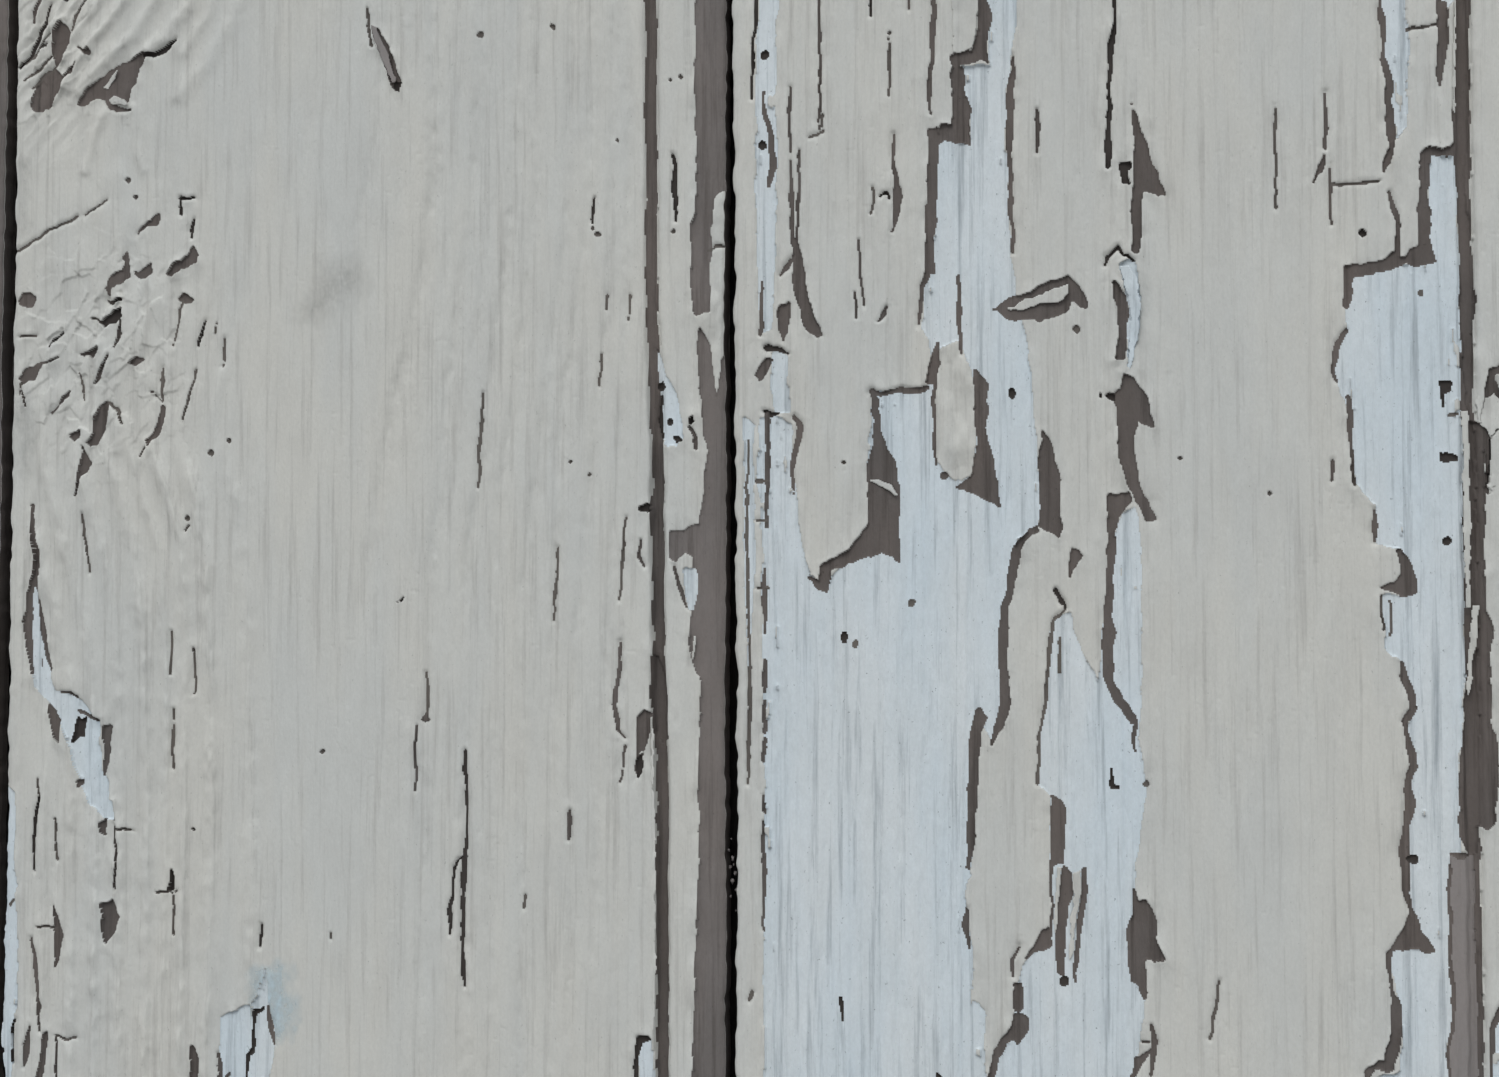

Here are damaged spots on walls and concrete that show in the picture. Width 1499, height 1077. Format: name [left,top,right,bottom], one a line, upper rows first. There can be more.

peeling [30,20,91,112]
peeling [77,39,177,112]
peeling [0,0,43,504]
peeling [51,345,109,447]
peeling [91,246,199,338]
peeling [145,368,166,446]
peeling [658,0,1166,1077]
peeling [1331,0,1499,1077]
peeling [22,504,120,944]
peeling [1,787,77,1077]
peeling [189,969,275,1077]
crack [447,749,469,986]